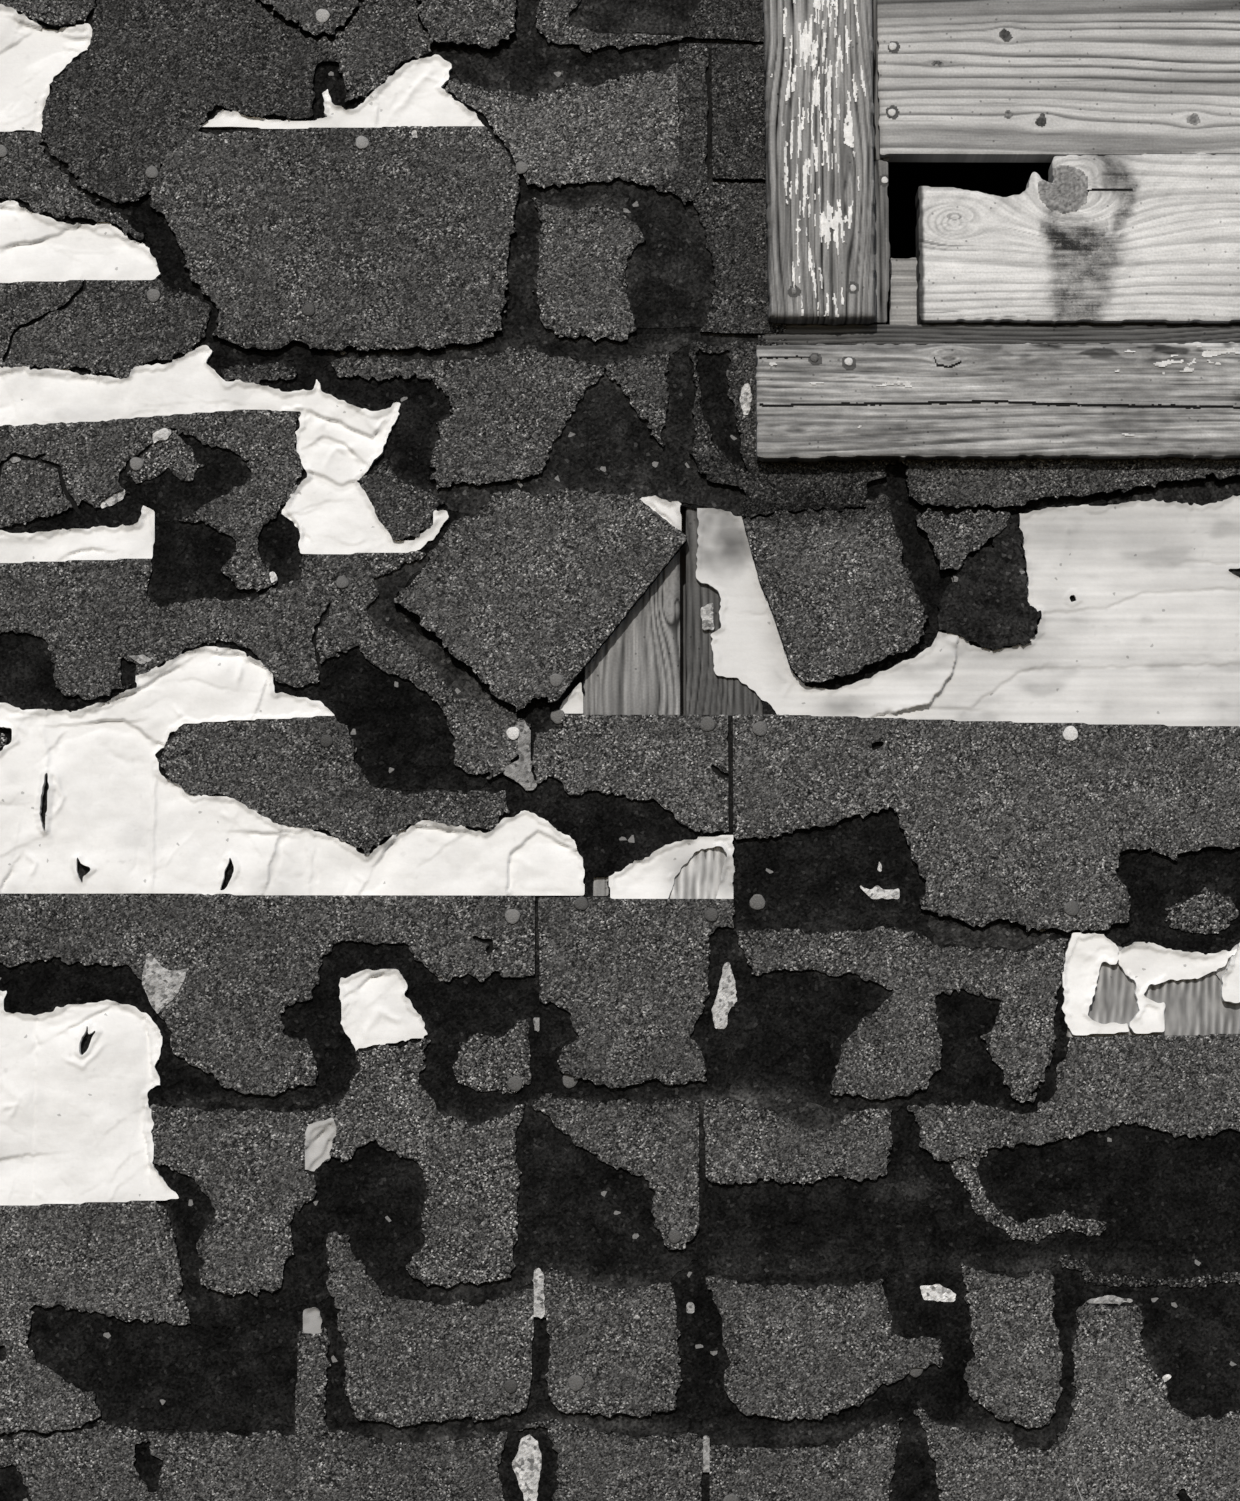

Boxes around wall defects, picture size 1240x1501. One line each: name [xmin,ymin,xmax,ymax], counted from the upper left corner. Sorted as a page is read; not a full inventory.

peeling [770,0,866,317]
damp [1046,226,1115,316]